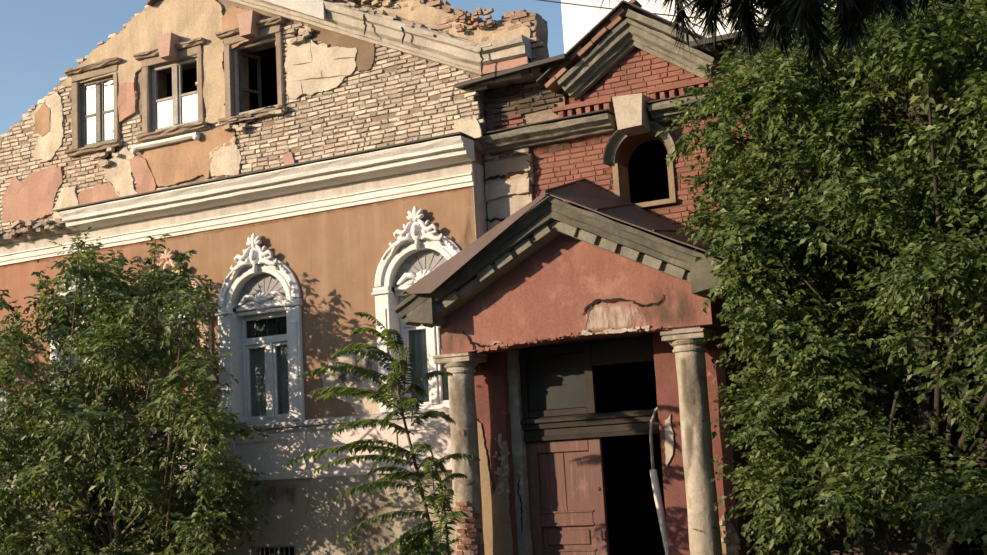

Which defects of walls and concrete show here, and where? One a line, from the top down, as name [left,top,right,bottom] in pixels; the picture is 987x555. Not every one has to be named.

flaking render [0,0,568,232]
crack [463,331,501,352]
crack [581,294,664,336]
peeling [320,340,380,416]
peeling [493,434,510,494]
flaking render [454,501,485,555]
flaking render [710,511,741,555]